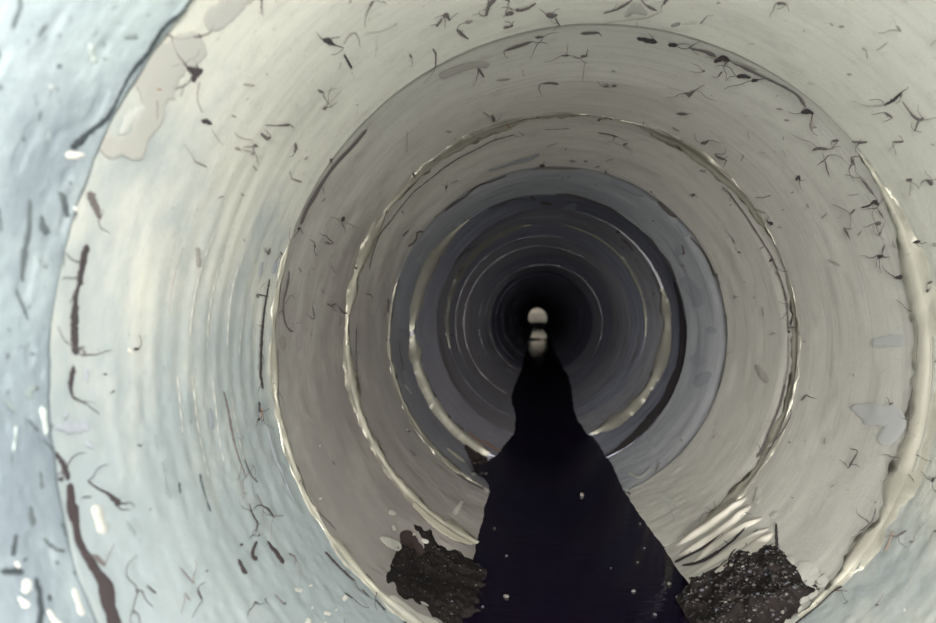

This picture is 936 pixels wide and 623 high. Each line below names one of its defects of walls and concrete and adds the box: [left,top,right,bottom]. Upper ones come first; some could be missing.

spalling [380,510,429,557]
peeling [786,557,829,613]
peeling [390,595,439,623]